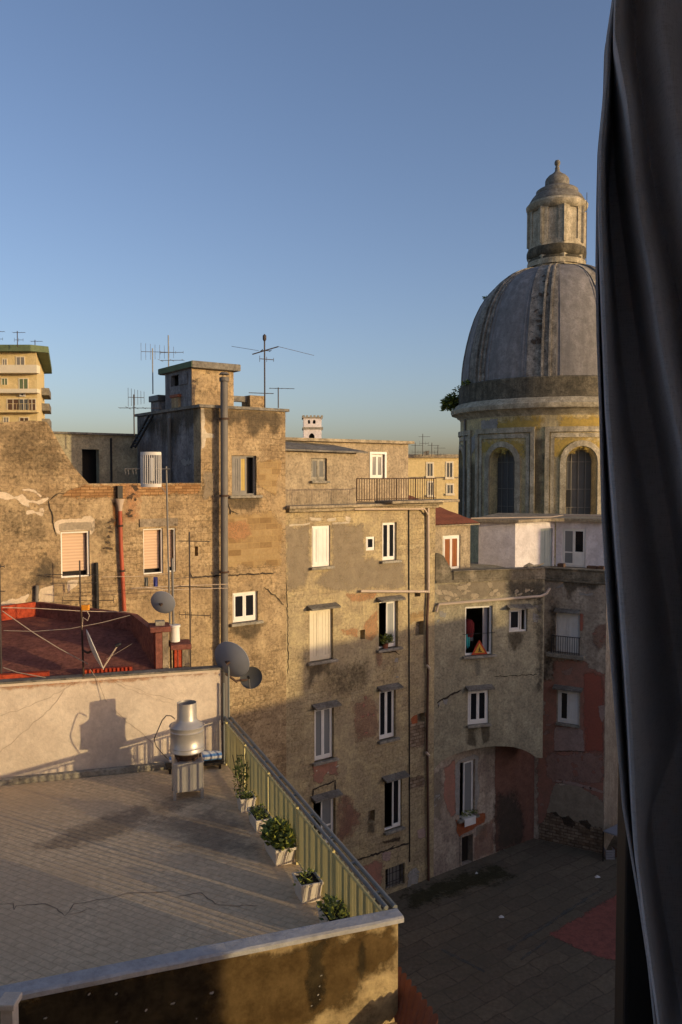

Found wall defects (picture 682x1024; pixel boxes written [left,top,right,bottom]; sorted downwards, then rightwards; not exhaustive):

peeling [0,489,49,516]
crack [48,493,65,536]
peeling [444,660,605,853]
crack [9,891,259,915]
leakage [18,926,398,1024]